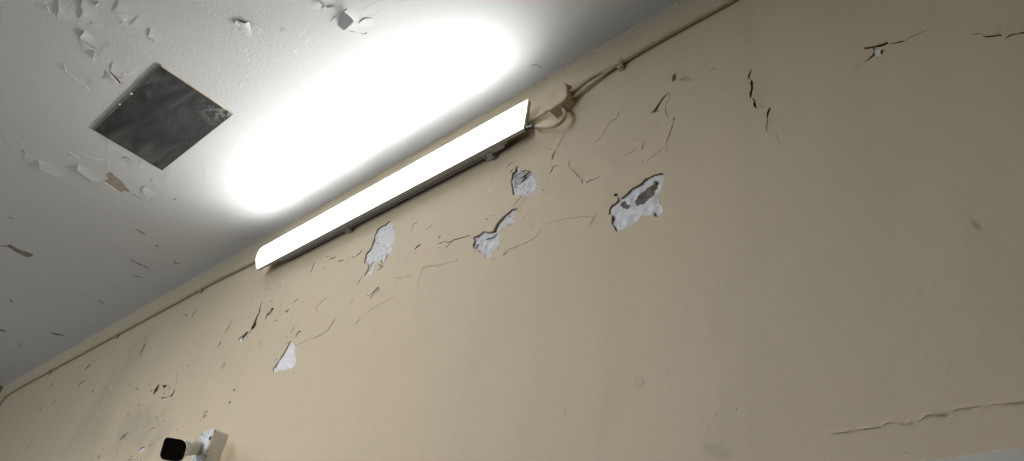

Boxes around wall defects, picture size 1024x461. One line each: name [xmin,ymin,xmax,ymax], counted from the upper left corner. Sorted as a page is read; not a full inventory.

peeling [33,0,145,61]
peeling [310,0,373,34]
crack [978,22,1024,39]
crack [650,91,670,113]
crack [732,54,799,141]
peeling [39,151,160,207]
flaking render [472,166,536,259]
flaking render [609,173,664,232]
flaking render [353,221,395,275]
flaking render [273,320,334,372]